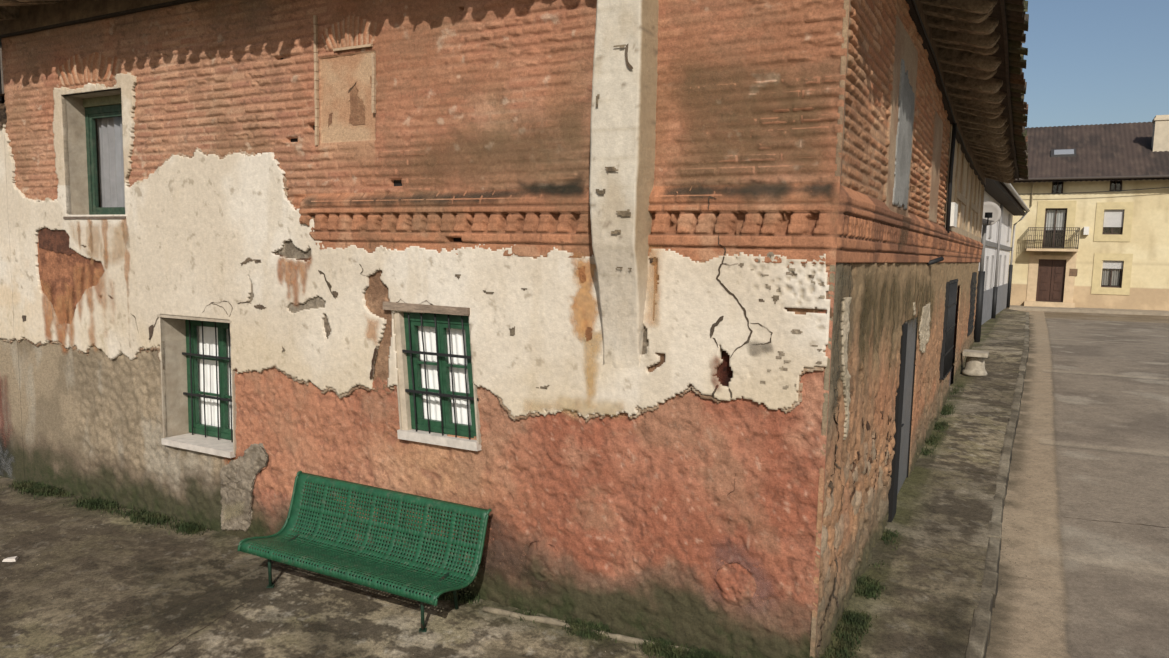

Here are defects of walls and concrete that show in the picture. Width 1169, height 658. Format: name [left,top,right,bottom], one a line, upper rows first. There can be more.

flaking render [37,228,113,352]
flaking render [359,264,394,394]
crack [708,196,773,358]